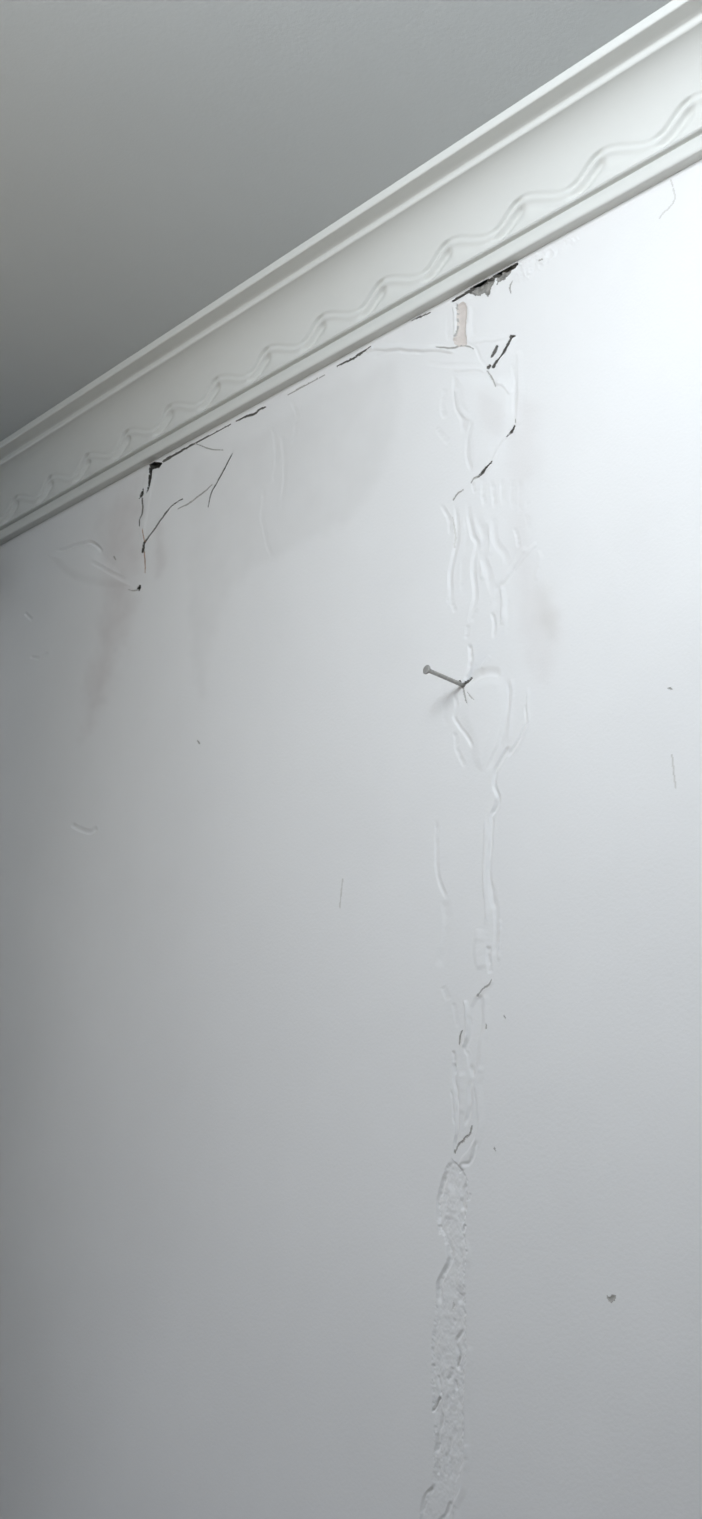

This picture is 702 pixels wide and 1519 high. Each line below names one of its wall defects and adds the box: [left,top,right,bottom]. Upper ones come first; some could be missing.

crack [136,346,371,573]